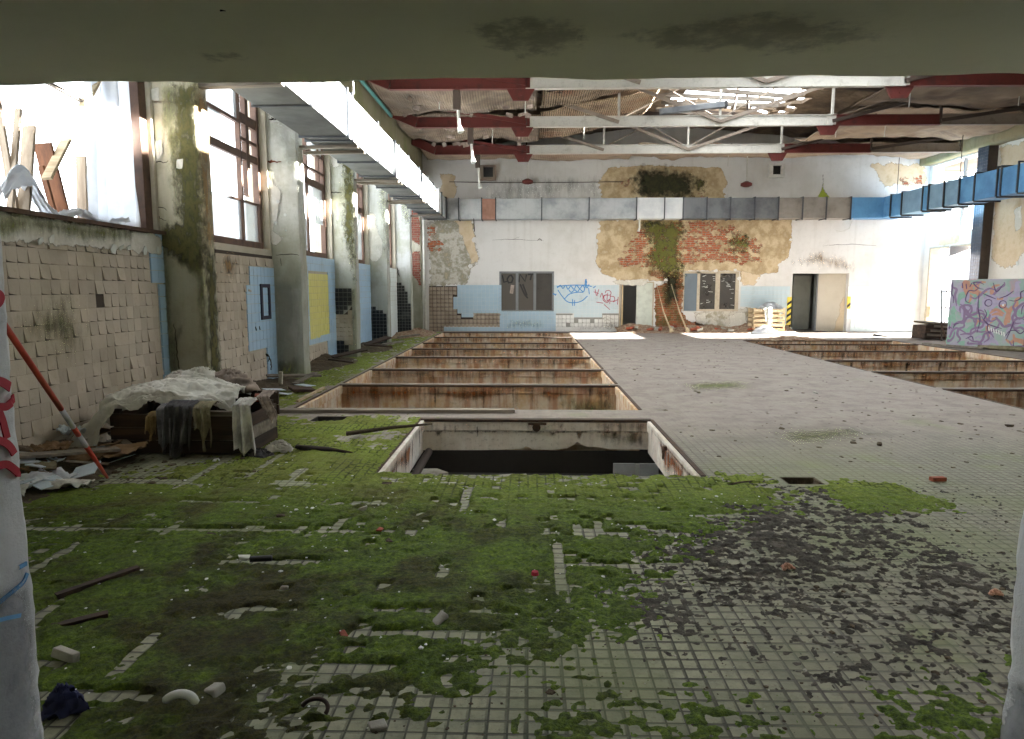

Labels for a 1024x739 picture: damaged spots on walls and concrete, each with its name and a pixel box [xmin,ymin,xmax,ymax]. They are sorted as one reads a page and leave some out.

peeling [870,163,927,191]
peeling [999,141,1024,169]
peeling [0,211,162,255]
peeling [412,210,483,287]
peeling [594,220,792,327]
peeling [992,198,1024,269]
rust [347,339,567,403]